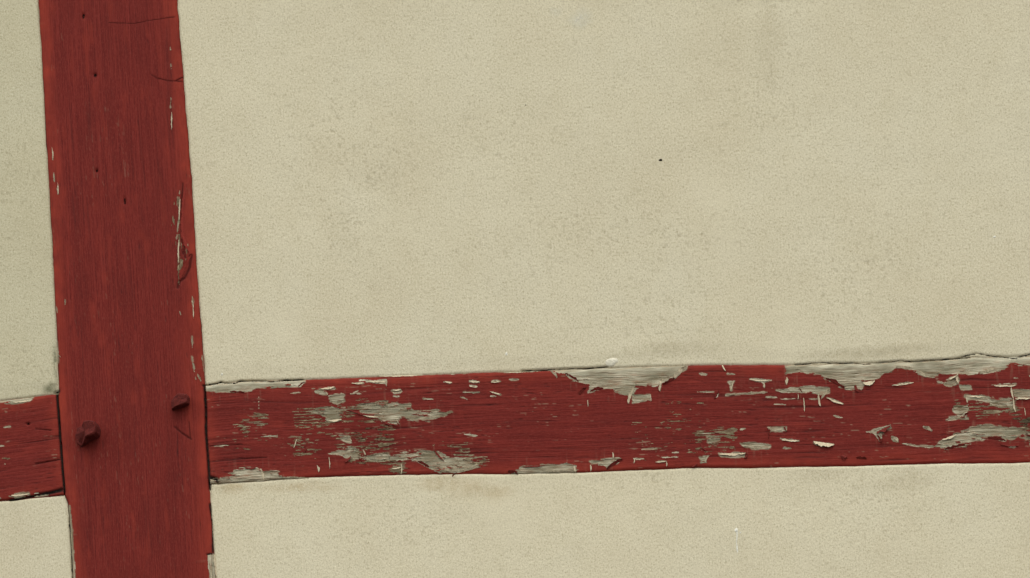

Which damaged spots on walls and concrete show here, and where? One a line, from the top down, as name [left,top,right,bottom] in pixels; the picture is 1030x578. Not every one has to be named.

peeling [461,371,538,399]
peeling [551,365,687,404]
peeling [0,397,34,405]
peeling [191,336,490,484]
peeling [508,463,577,474]